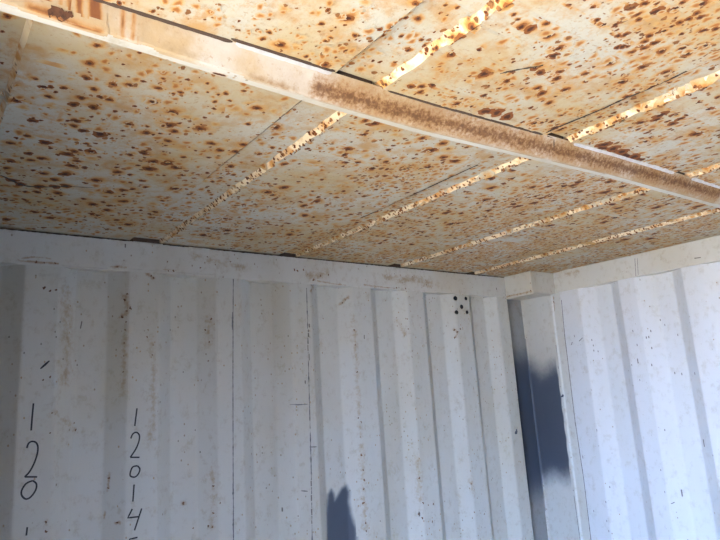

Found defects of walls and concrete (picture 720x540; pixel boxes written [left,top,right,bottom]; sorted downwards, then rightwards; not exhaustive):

rust [0,0,720,295]